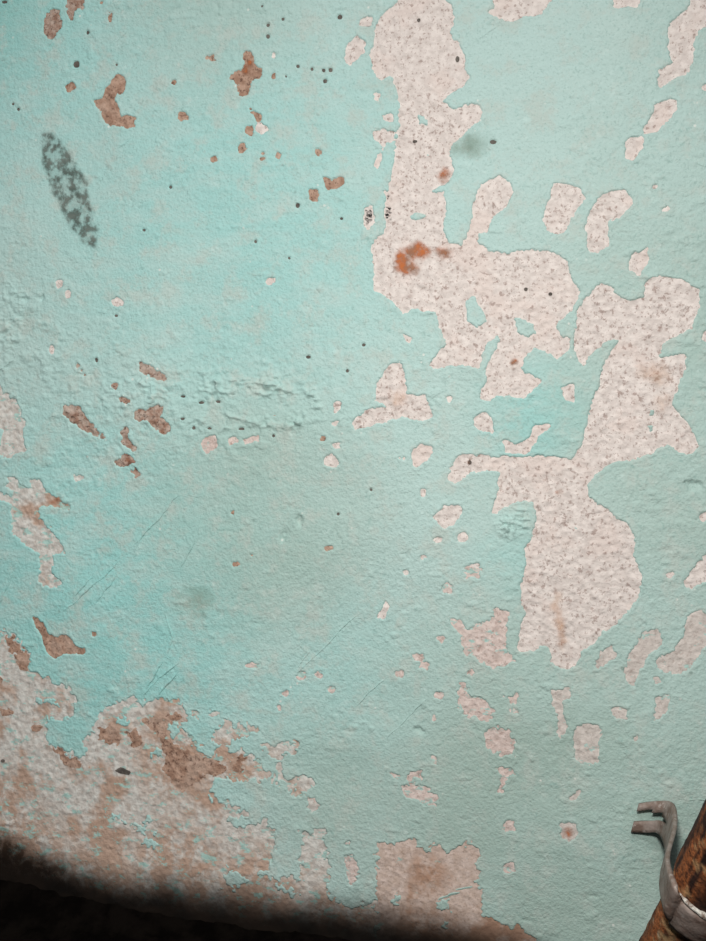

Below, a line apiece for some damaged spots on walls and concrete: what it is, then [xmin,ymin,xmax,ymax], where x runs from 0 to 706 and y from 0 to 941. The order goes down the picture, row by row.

peeling [94,64,136,129]
peeling [230,51,287,96]
peeling [238,108,269,153]
mould [43,134,96,246]
peeling [296,177,344,208]
corrosion [396,243,449,273]
peeling [0,385,27,458]
peeling [320,436,340,467]
peeling [344,0,706,793]
peeling [0,477,70,588]
peeling [32,617,85,659]
peeling [0,628,536,941]